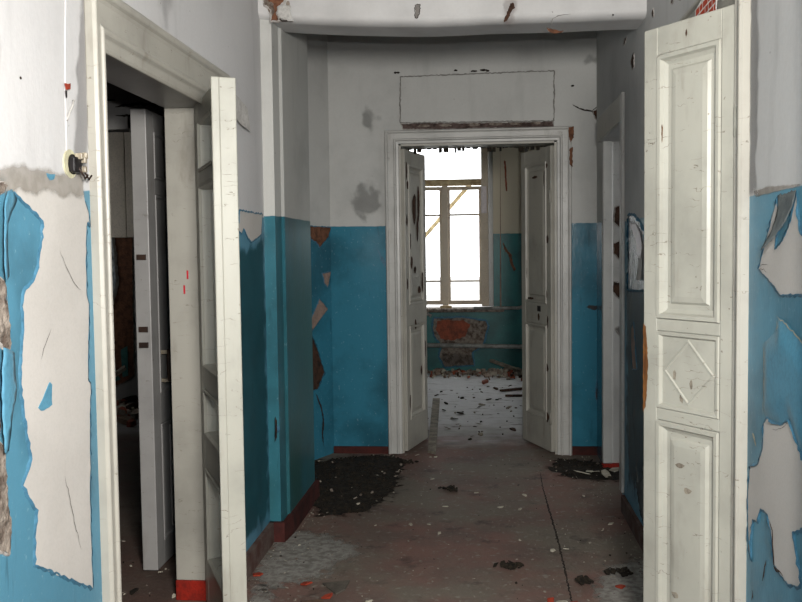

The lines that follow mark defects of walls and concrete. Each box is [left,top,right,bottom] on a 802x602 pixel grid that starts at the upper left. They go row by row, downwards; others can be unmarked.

flaking render [263,0,293,23]
peeling [239,209,263,243]
peeling [310,225,332,248]
peeling [613,205,644,299]
peeling [758,190,802,298]
peeling [0,181,94,591]
flaking render [111,237,135,387]
flaking render [312,298,328,391]
flaking render [425,316,490,368]
peeling [746,417,802,590]